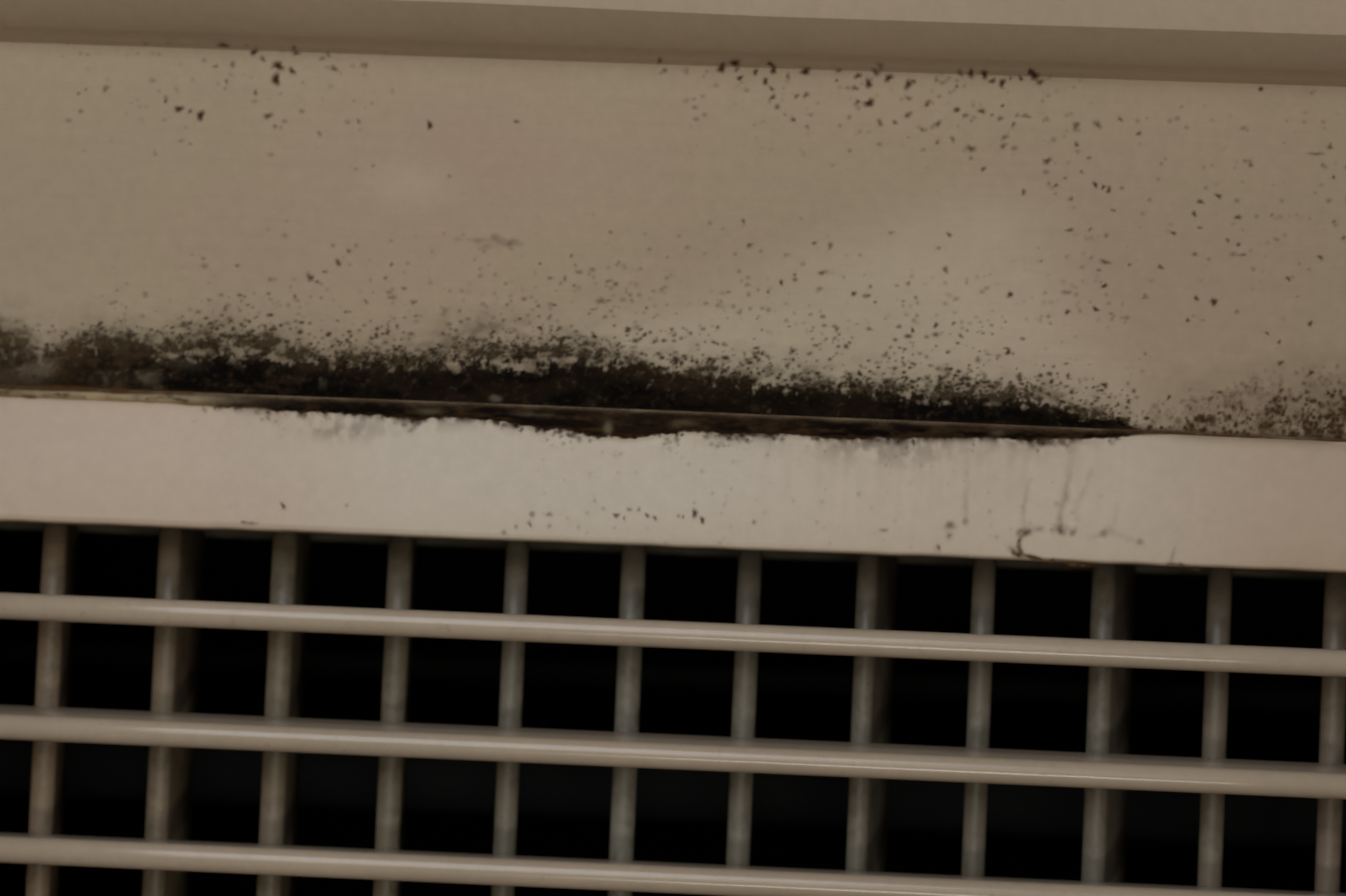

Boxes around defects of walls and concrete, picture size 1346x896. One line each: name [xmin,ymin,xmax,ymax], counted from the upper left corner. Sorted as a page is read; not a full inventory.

leakage [718,61,775,98]
leakage [969,70,1042,86]
leakage [0,306,1163,445]
leakage [1183,390,1346,439]